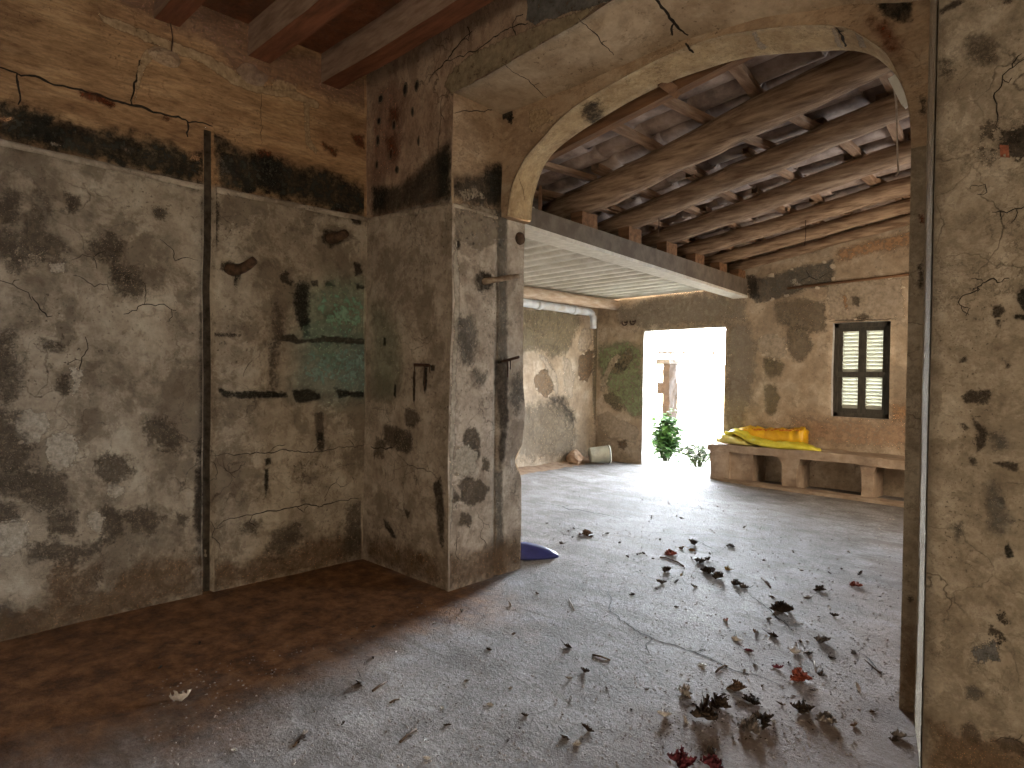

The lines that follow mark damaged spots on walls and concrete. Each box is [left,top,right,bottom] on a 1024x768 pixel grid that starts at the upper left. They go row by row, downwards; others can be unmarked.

crack [655,0,694,53]
crack [0,60,213,137]
crack [429,14,528,148]
crack [993,53,1024,130]
crack [971,184,1024,223]
crack [958,278,1009,315]
damp [0,101,580,641]
damp [593,324,623,424]
damp [610,347,634,374]
damp [615,292,827,430]
crack [210,439,433,481]
crack [211,477,358,550]